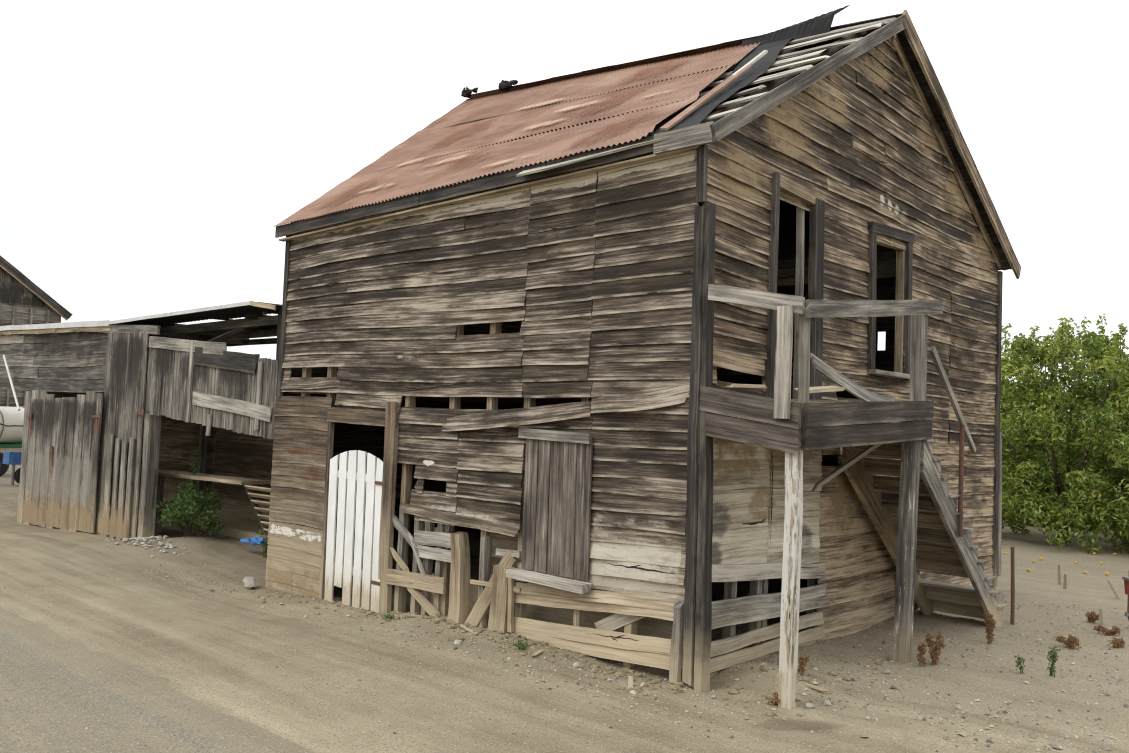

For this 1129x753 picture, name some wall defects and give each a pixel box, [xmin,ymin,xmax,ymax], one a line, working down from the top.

peeling [270,524,322,542]